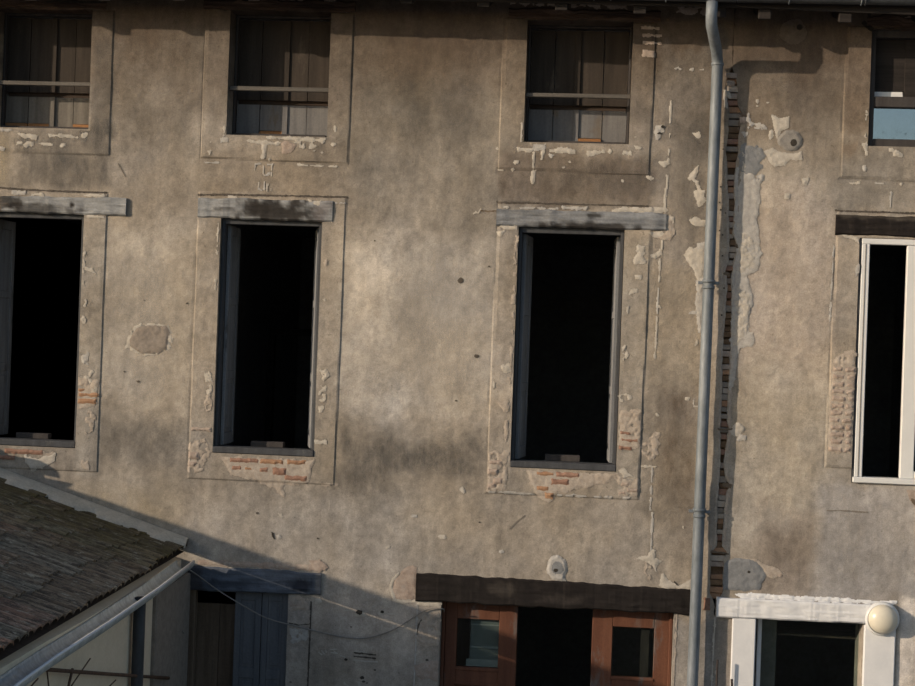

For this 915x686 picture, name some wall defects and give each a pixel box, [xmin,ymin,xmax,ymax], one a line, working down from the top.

peeling [0,128,88,148]
peeling [496,225,519,318]
peeling [498,122,642,184]
peeling [612,100,675,359]
peeling [684,242,705,346]
peeling [688,165,706,227]
crack [703,68,747,610]
peeling [728,152,764,390]
peeling [741,99,803,167]
flaking render [187,427,315,497]
flaking render [486,393,691,589]
peeling [723,558,897,605]